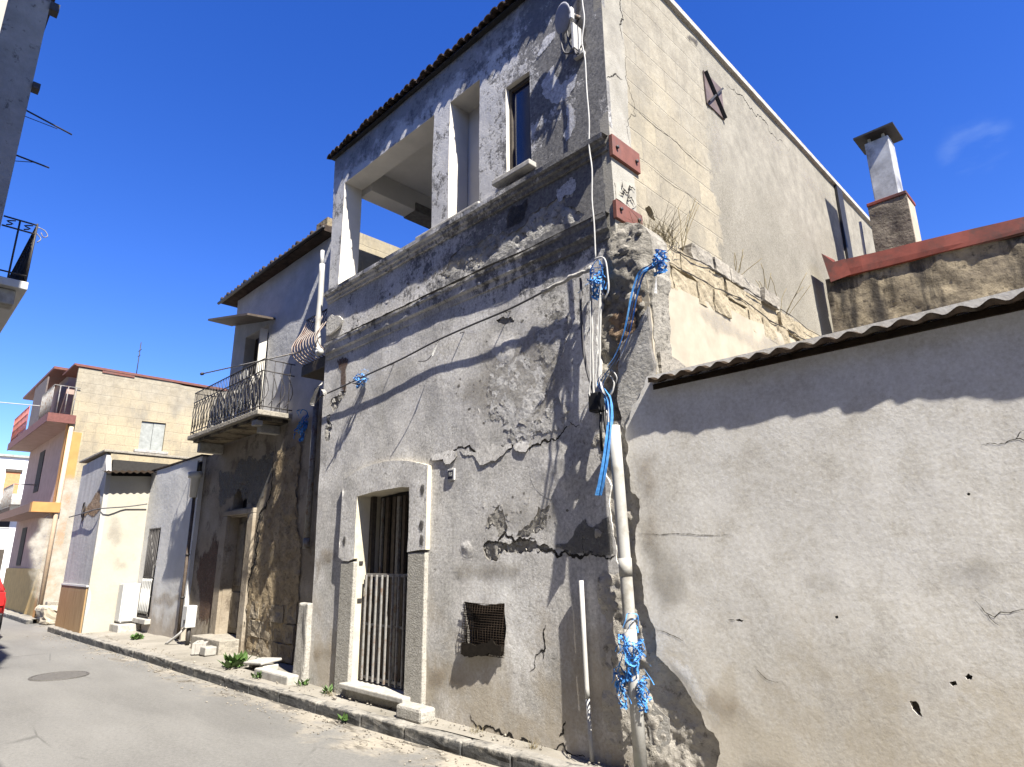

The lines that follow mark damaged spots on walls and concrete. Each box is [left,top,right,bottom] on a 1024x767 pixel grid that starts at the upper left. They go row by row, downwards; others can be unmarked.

spalling [482,492,569,561]
spalling [591,222,720,767]
crack [529,625,546,672]